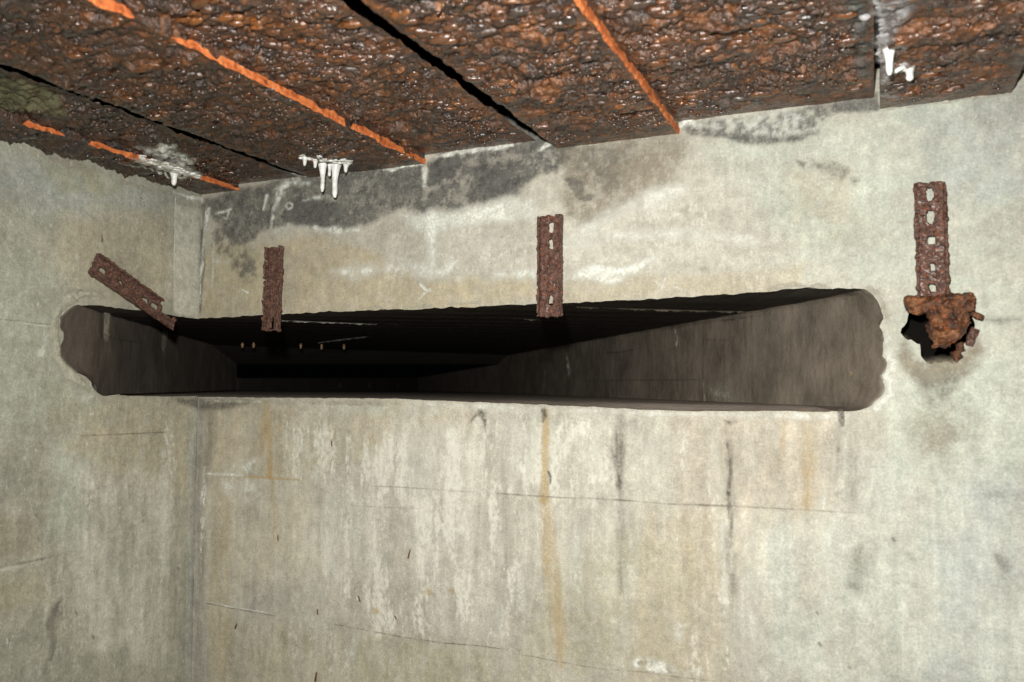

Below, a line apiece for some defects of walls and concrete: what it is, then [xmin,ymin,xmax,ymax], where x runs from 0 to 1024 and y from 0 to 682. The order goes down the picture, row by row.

leakage [119,144,201,186]
rust [0,0,432,191]
leakage [199,108,684,309]
rust [382,0,864,142]
leakage [687,0,915,143]
rust [880,0,1024,101]
spalling [901,313,975,364]
rust [950,306,984,362]